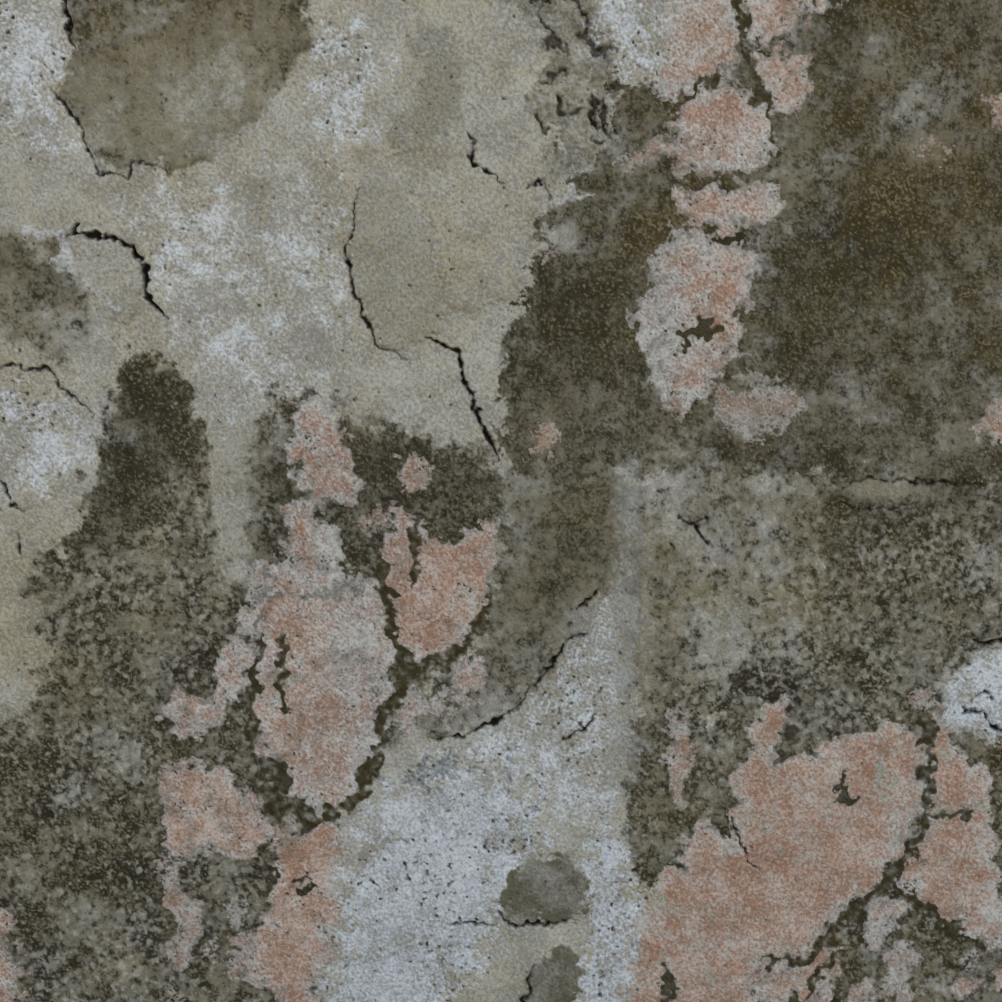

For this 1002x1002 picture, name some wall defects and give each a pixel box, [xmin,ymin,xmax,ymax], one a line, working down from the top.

spalling [0,0,83,172]
crack [49,88,169,181]
crack [65,222,169,319]
crack [343,186,408,361]
peeling [487,0,849,446]
spalling [21,0,399,820]
peeling [392,451,436,498]
crack [424,336,501,462]
water stain [0,220,511,1002]
peeling [352,500,506,664]
crack [431,589,598,741]
peeling [153,598,1002,1002]